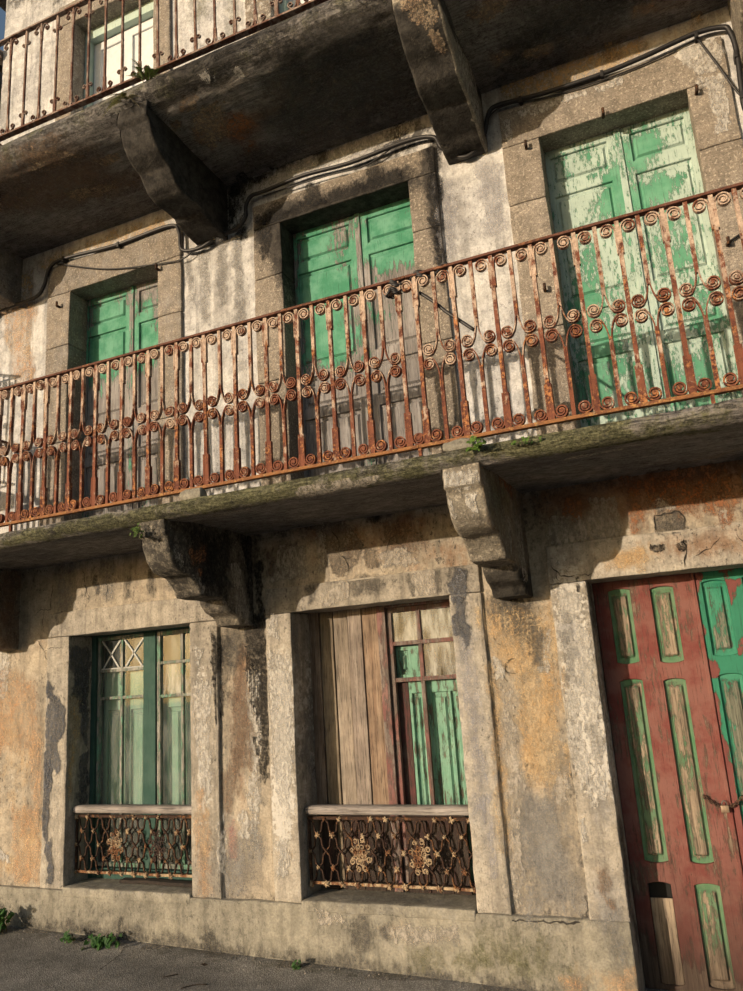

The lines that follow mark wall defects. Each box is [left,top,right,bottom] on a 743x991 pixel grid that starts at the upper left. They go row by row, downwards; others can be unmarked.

damp [186,4,426,322]
damp [295,475,379,500]
damp [69,645,92,804]
damp [187,525,269,896]